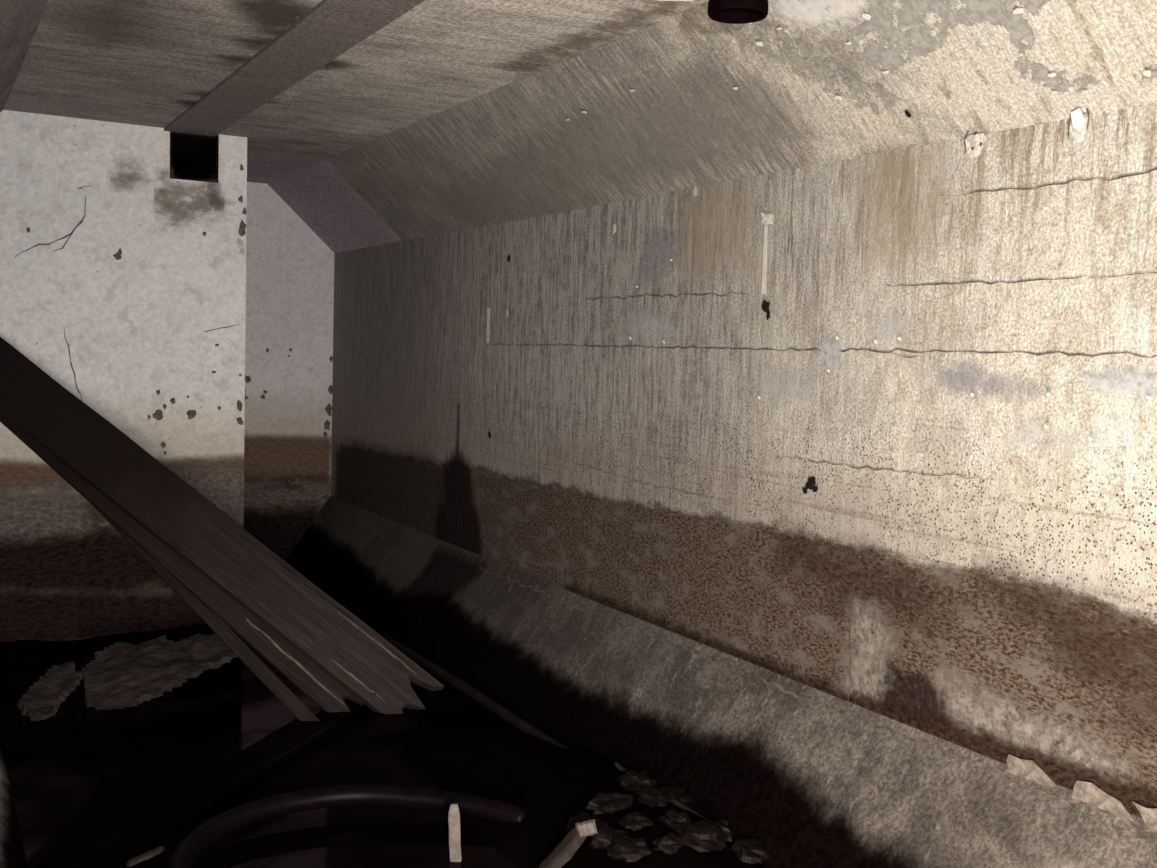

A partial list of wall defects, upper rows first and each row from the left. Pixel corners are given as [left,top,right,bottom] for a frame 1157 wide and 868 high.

peeling [748,0,1101,113]
peeling [1134,69,1157,80]
peeling [1071,108,1085,132]
crack [1068,108,1089,141]
crack [939,168,1157,196]
damp [159,187,223,221]
crack [14,186,86,258]
crack [887,272,1157,287]
crack [485,314,1157,358]
damp [159,417,1157,795]